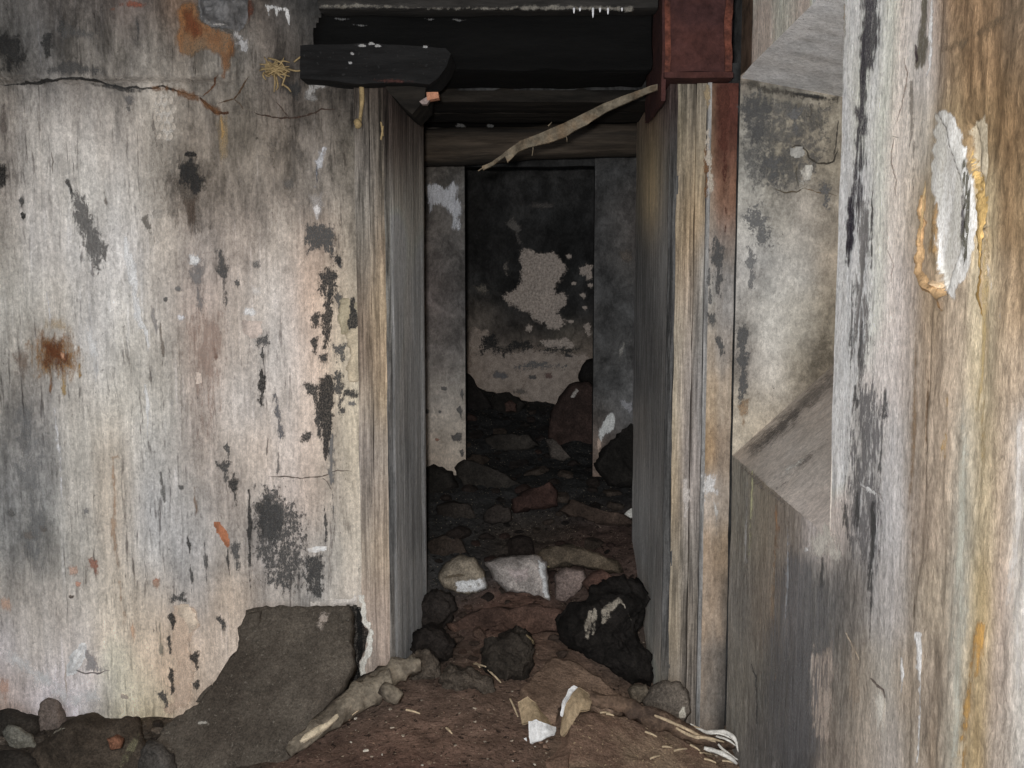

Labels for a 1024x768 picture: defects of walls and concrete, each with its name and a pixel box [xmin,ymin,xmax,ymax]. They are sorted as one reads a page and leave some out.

rust [177,3,234,78]
crack [4,75,334,119]
crack [792,113,839,165]
spalling [929,110,988,299]
peeling [503,218,593,349]
rust [15,333,81,395]
peeling [337,297,359,382]
damp [841,492,876,627]